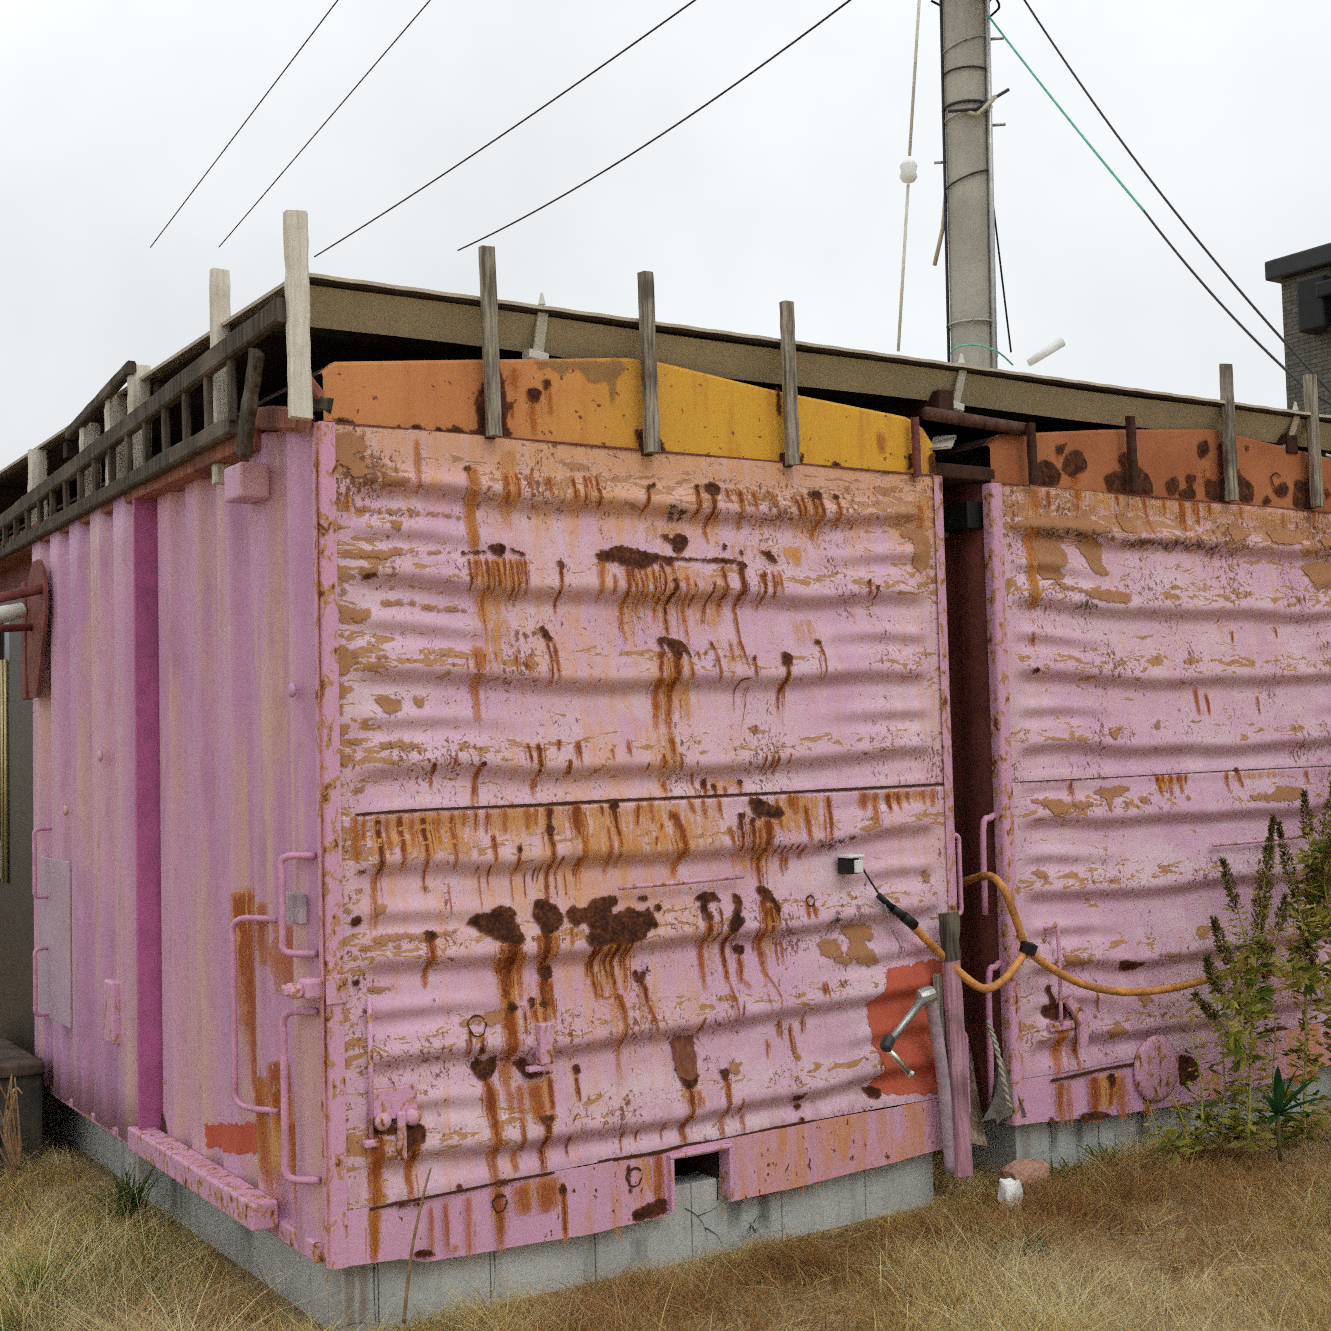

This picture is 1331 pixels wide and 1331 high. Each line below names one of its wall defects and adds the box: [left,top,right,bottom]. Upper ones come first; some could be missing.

rust [396,381,485,492]
rust [499,366,603,522]
rust [461,465,561,718]
peeling [1012,513,1137,604]
rust [1022,439,1317,609]
peeling [1267,529,1331,591]
rust [596,481,856,1062]
peeling [1031,869,1050,879]
peeling [1032,784,1149,816]
rust [465,856,707,1190]
peeling [816,923,946,1096]
rust [366,1123,427,1260]